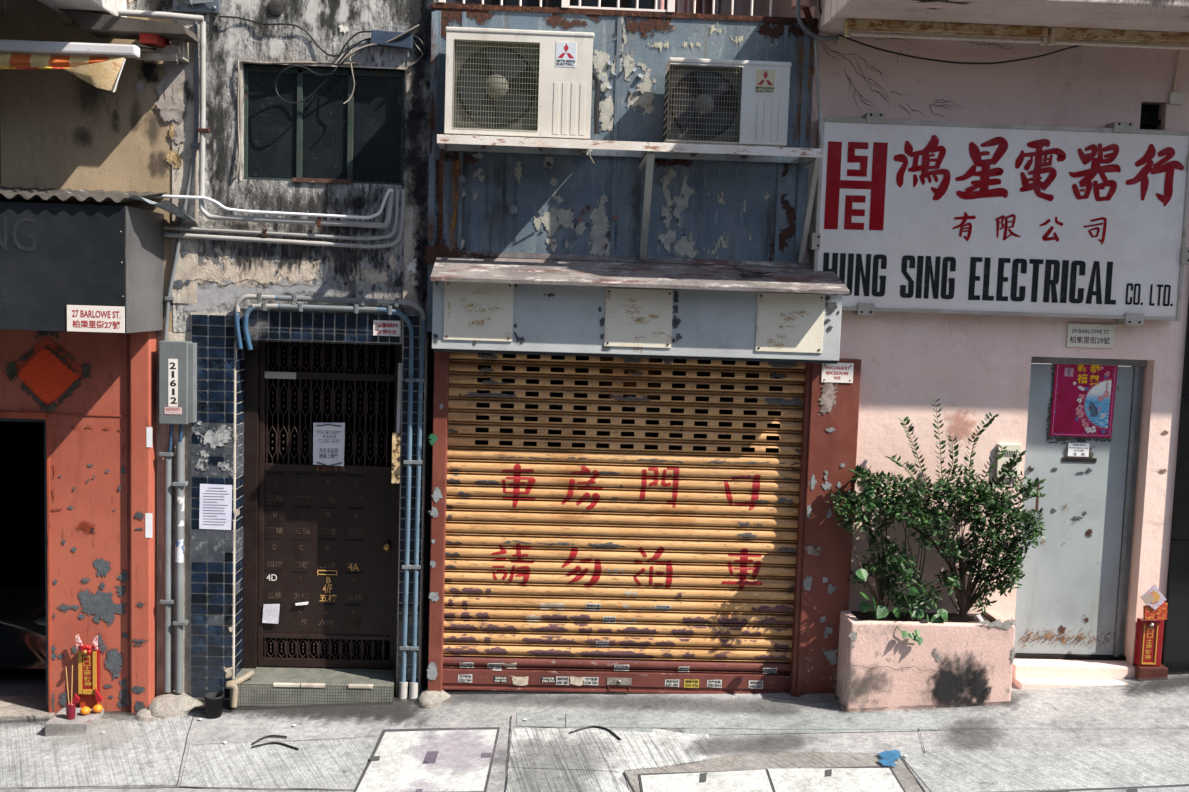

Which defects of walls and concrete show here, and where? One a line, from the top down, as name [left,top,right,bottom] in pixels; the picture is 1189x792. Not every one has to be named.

mould [146,0,173,12]
corrosion [429,1,495,41]
corrosion [543,13,601,30]
water stain [132,106,157,139]
water stain [150,153,166,175]
water stain [182,0,432,306]
corrosion [769,163,796,261]
spalling [429,487,443,518]
spalling [53,558,131,708]
peeling [429,587,794,666]
corrosion [1018,615,1115,648]
spalling [427,662,438,681]